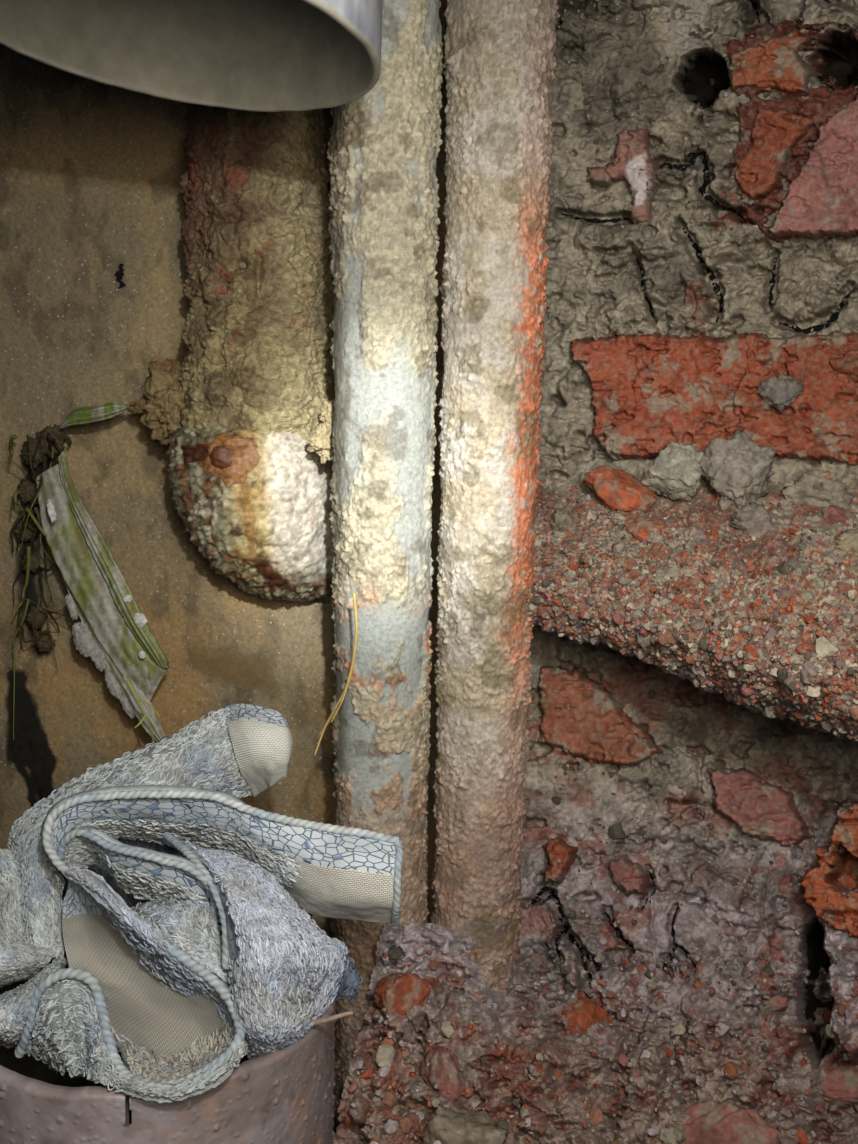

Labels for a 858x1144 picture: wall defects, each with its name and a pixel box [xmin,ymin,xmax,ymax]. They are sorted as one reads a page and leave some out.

crack [750,0,761,23]
spalling [722,16,858,243]
crack [561,213,629,224]
crack [660,152,742,218]
crack [635,255,655,318]
crack [682,227,723,323]
crack [768,257,854,334]
rust [181,433,295,599]
spalling [707,767,858,938]